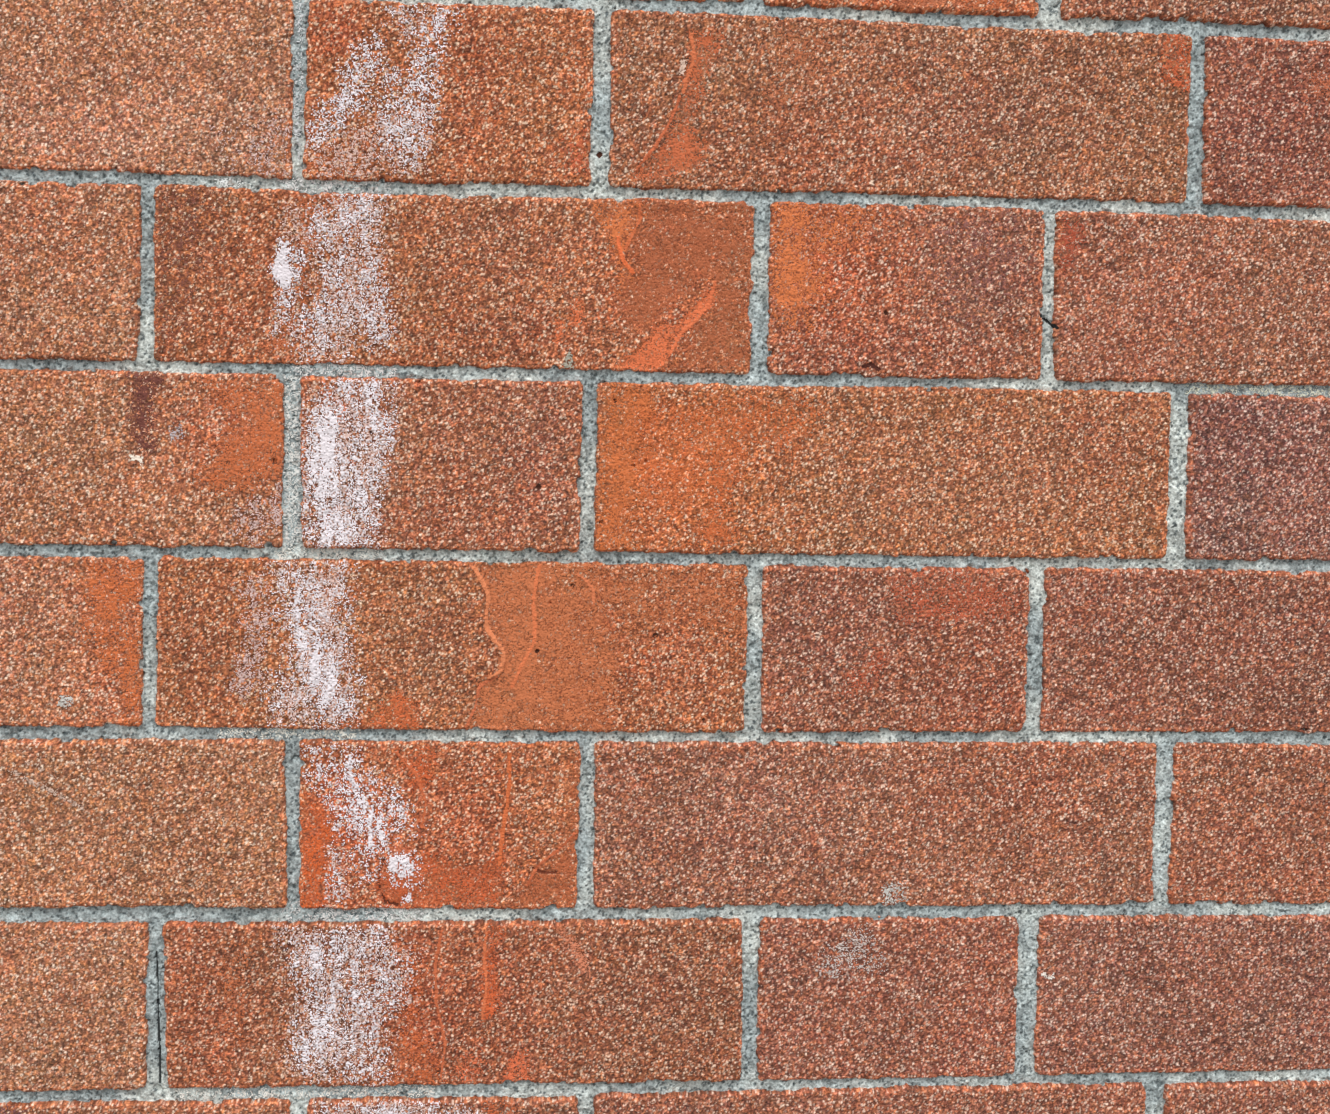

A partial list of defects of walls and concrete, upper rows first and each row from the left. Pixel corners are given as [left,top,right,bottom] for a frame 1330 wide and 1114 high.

damp [124,0,478,1114]